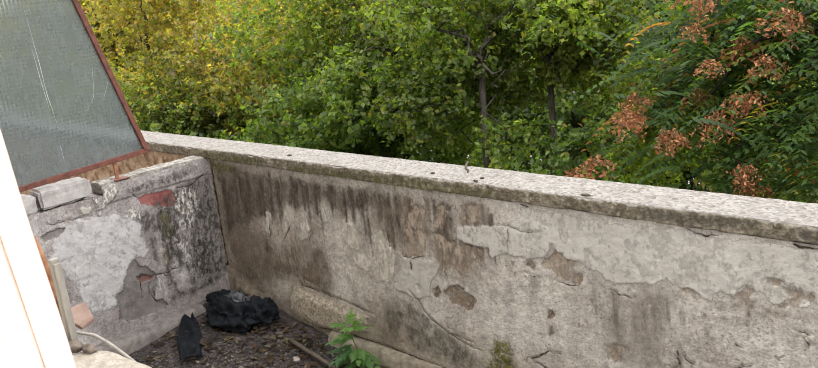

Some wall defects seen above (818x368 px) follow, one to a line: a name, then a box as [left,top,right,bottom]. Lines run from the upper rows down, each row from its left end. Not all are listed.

peeling [20,150,188,321]
water stain [124,167,493,298]
crack [297,269,370,313]
crack [408,290,480,350]
flaking render [341,202,818,311]